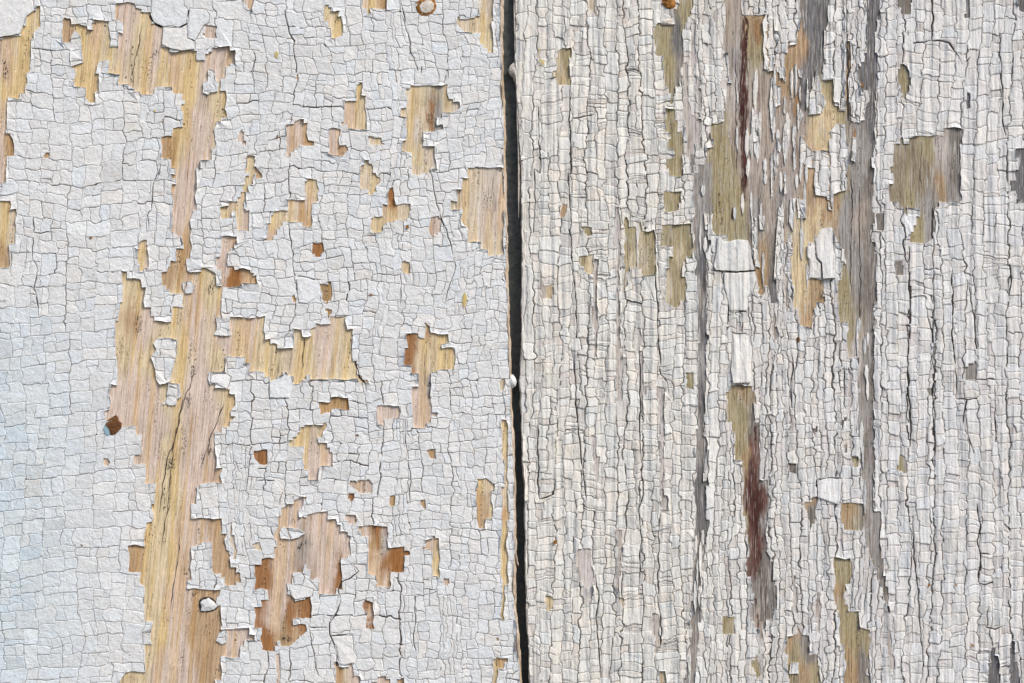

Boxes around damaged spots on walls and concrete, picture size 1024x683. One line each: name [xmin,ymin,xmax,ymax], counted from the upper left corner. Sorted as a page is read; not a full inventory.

peeling [0,0,40,184]
crack [844,10,852,121]
crack [907,0,970,62]
peeling [0,201,17,268]
peeling [63,0,460,683]
peeling [450,167,507,256]
crack [567,90,593,496]
peeling [614,0,890,683]
peeling [889,127,963,244]
crack [906,208,996,472]
crack [638,273,669,645]
crack [976,506,993,585]